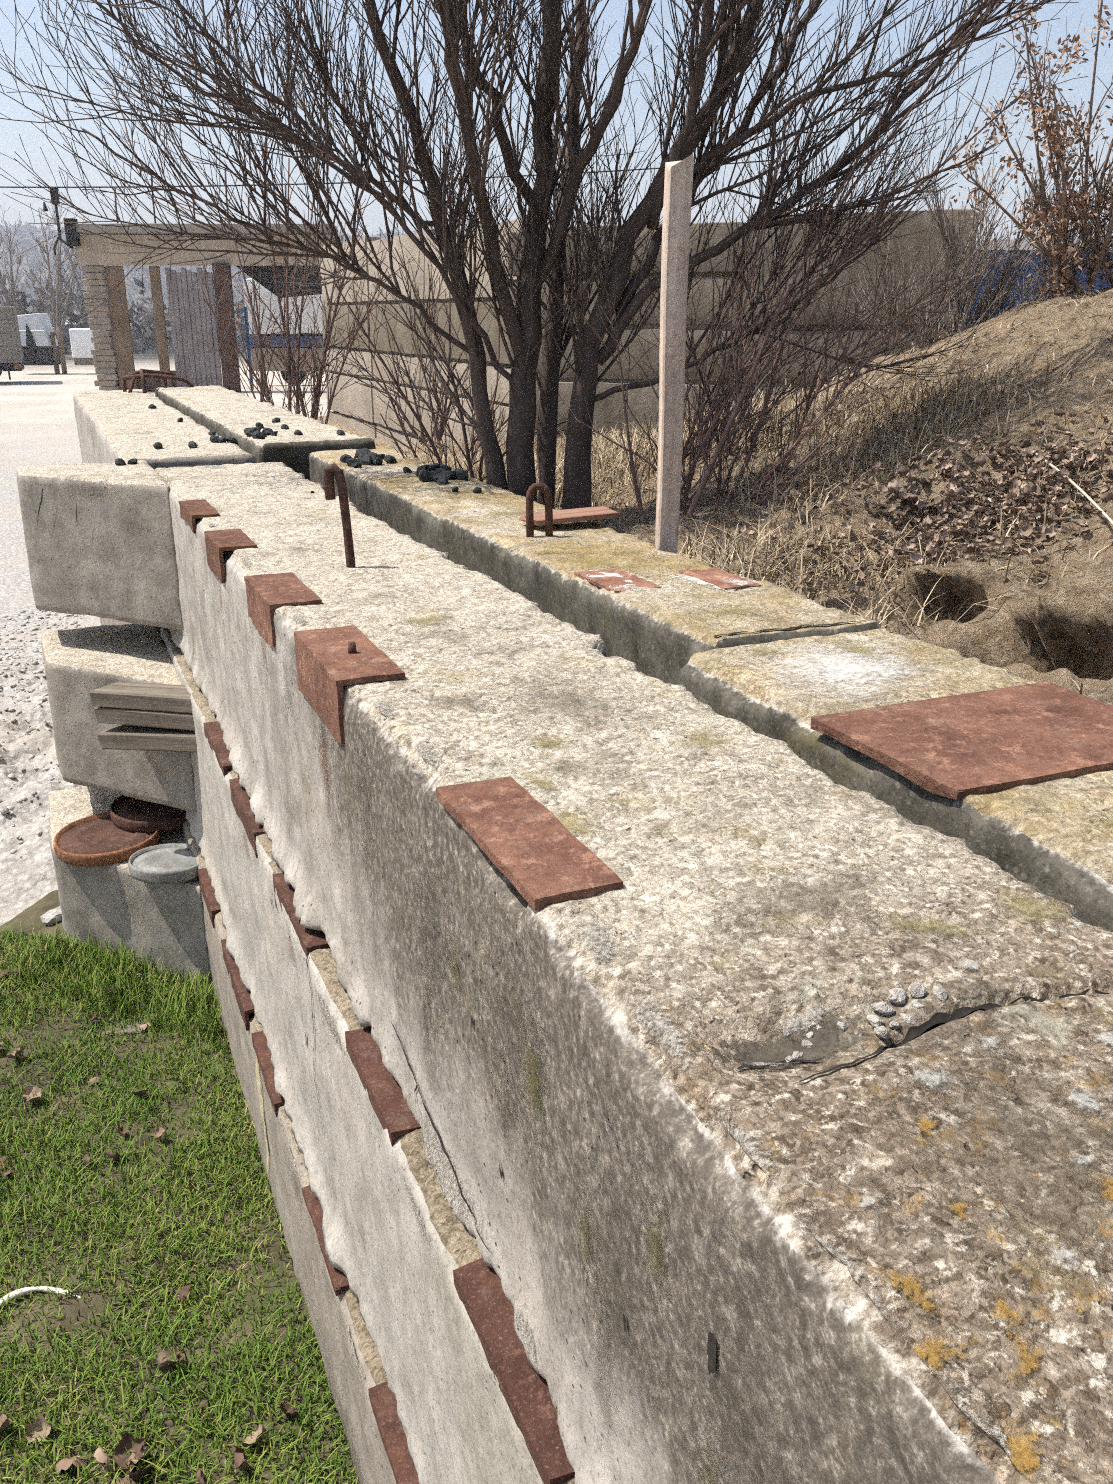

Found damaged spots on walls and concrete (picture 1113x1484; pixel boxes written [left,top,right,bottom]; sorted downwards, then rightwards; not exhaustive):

spalling [617,982,868,1070]
crack [737,989,1109,1082]